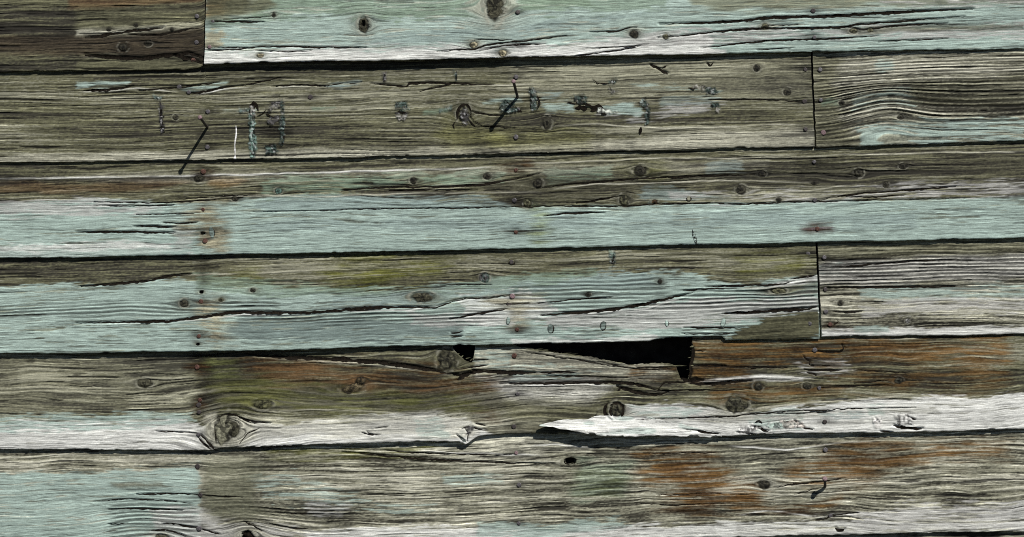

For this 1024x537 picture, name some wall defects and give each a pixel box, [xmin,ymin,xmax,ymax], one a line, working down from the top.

crack [81,259,964,454]
peeling [739,419,805,433]
crack [653,493,748,506]